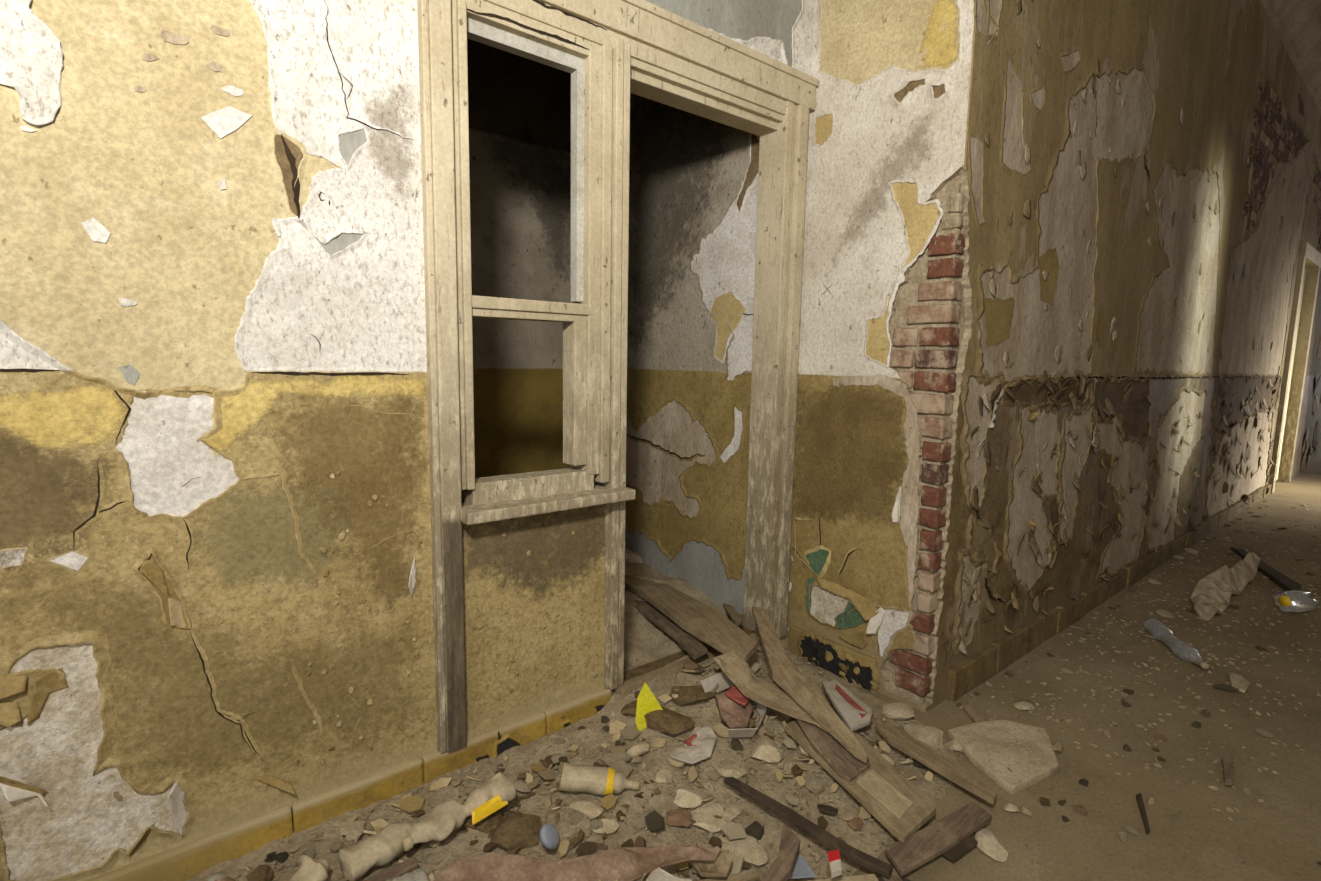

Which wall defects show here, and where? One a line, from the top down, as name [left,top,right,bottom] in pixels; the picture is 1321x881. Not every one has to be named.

peeling [646,0,1033,91]
crack [73,390,131,551]
peeling [0,0,372,524]
crack [183,519,197,570]
peeling [625,395,746,619]
peeling [689,133,760,383]
peeling [787,48,1321,697]
peeling [0,629,197,881]
crack [190,628,264,760]